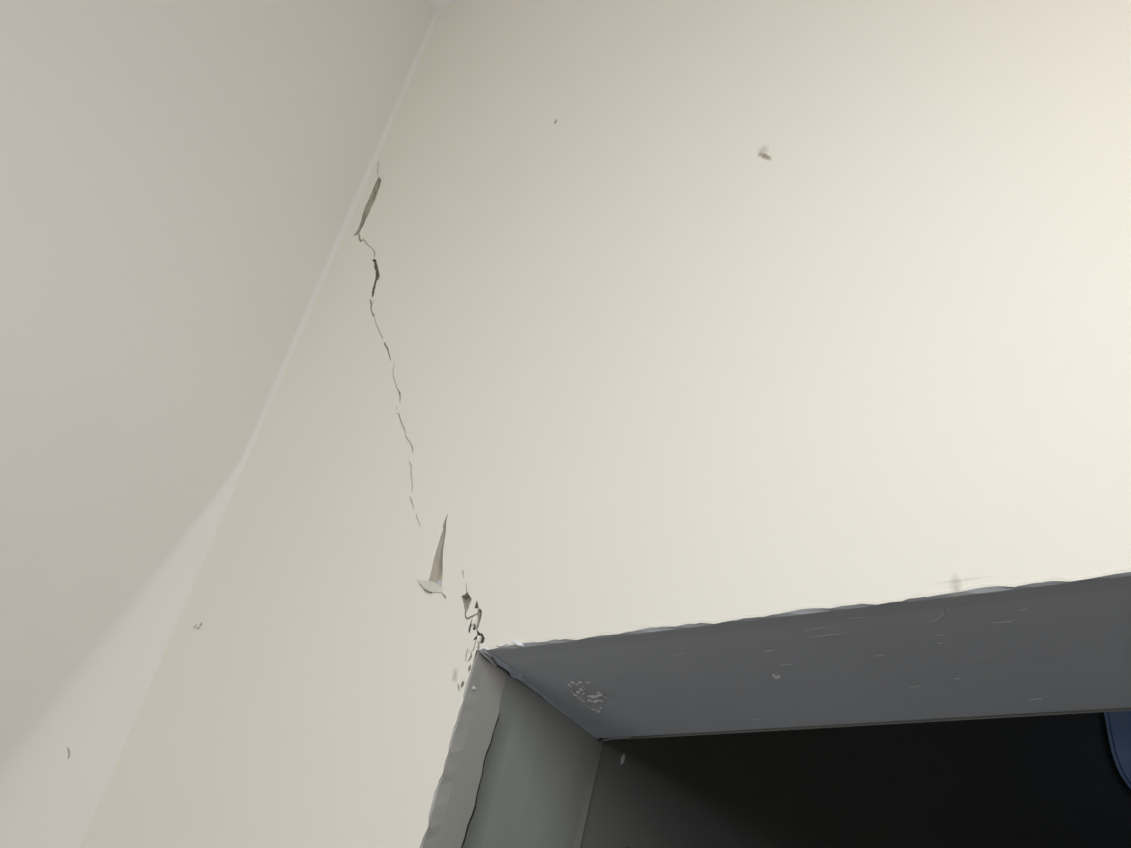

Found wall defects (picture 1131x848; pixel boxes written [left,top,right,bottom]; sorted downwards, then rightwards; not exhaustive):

crack [359,235,420,525]
peeling [417,583,599,848]